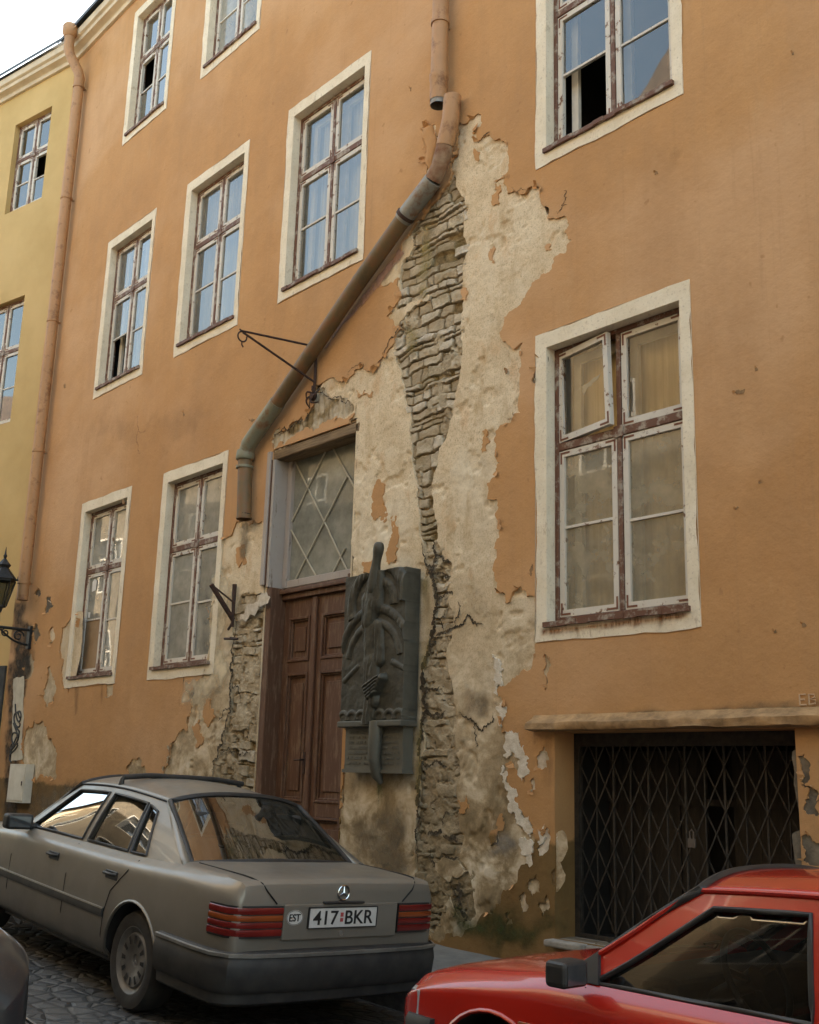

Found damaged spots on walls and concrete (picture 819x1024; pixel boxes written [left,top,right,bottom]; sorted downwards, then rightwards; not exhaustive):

flaking render [272,115,571,942]
flaking render [22,588,83,707]
flaking render [162,519,270,791]
flaking render [20,722,57,783]
crack [414,539,494,921]
flaking render [792,750,819,816]
flaking render [792,830,819,866]